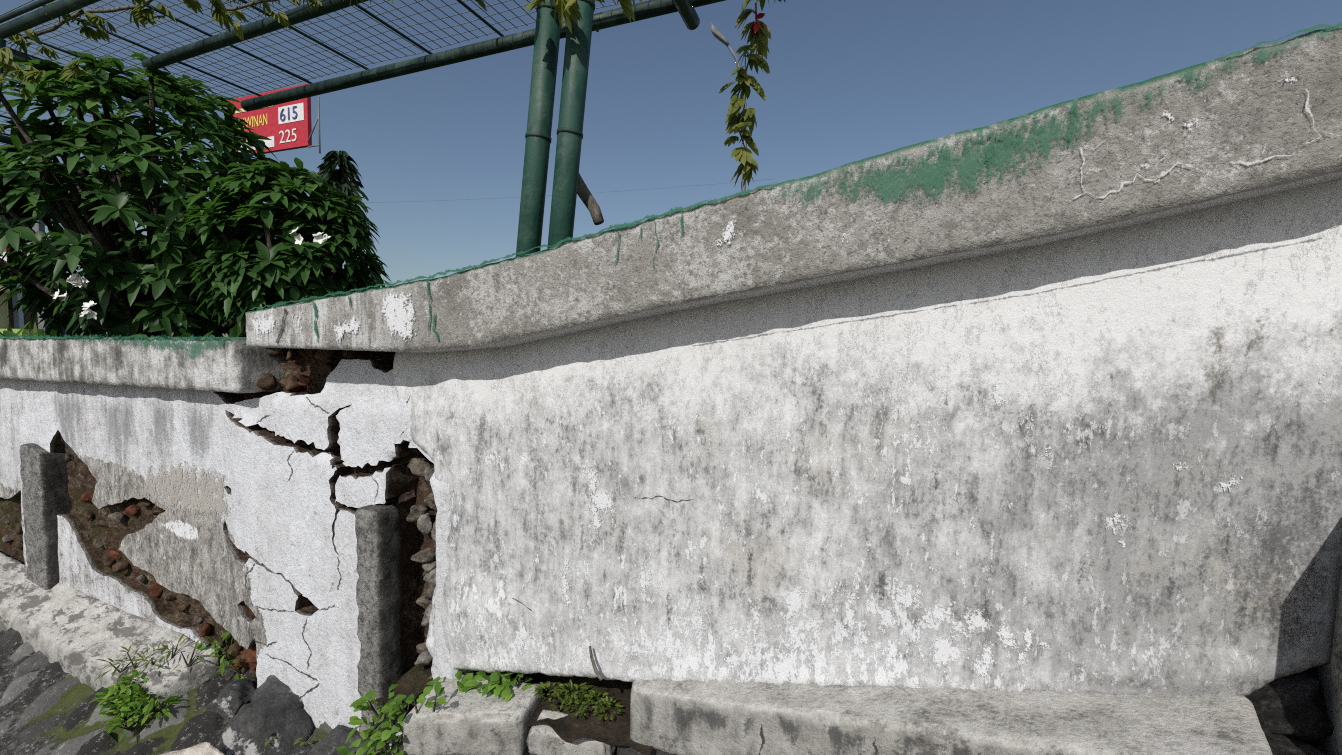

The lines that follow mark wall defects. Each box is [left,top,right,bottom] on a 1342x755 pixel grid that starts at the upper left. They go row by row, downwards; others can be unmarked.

crack [681,89,1342,303]
spalling [213,289,416,404]
spalling [0,482,25,564]
spalling [50,430,267,678]
crack [224,395,422,698]
spalling [385,451,437,679]
damp [1239,496,1327,654]